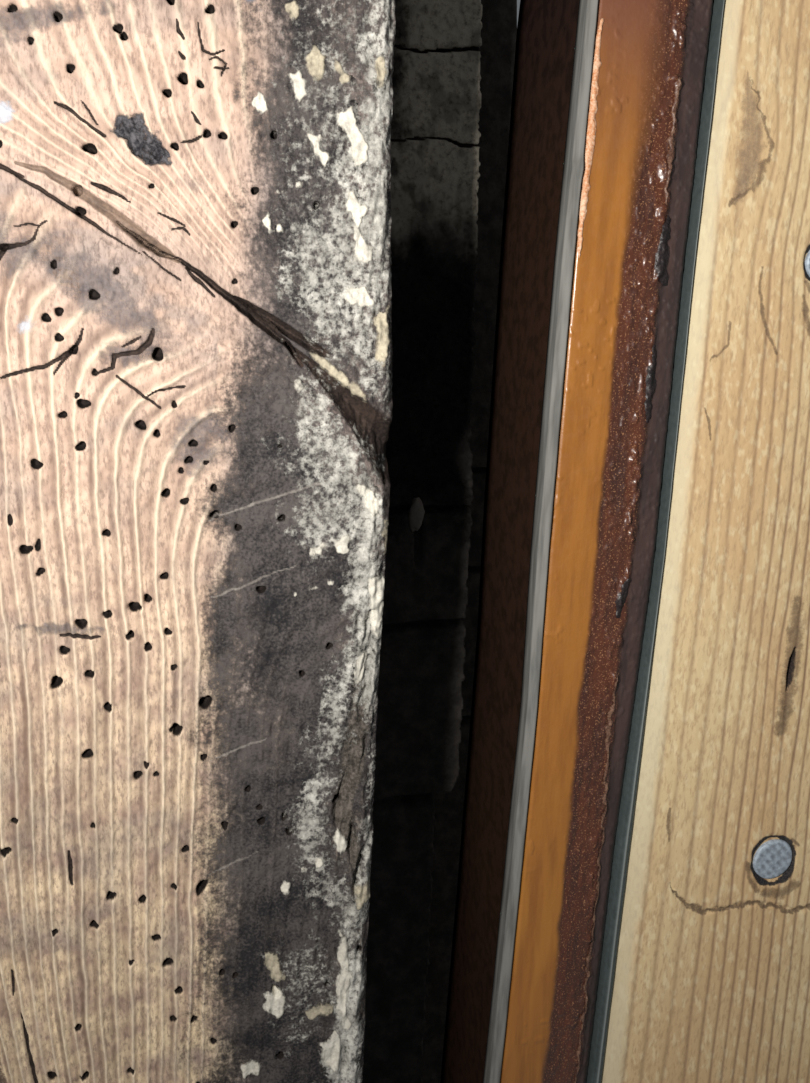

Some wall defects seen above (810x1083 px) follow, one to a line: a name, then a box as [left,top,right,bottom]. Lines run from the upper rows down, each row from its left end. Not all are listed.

crack [394,45,480,53]
peeling [252,92,267,113]
crack [391,136,479,148]
crack [0,161,392,480]
damp [175,419,217,467]
peeling [262,0,395,1083]
peeling [241,1060,260,1079]